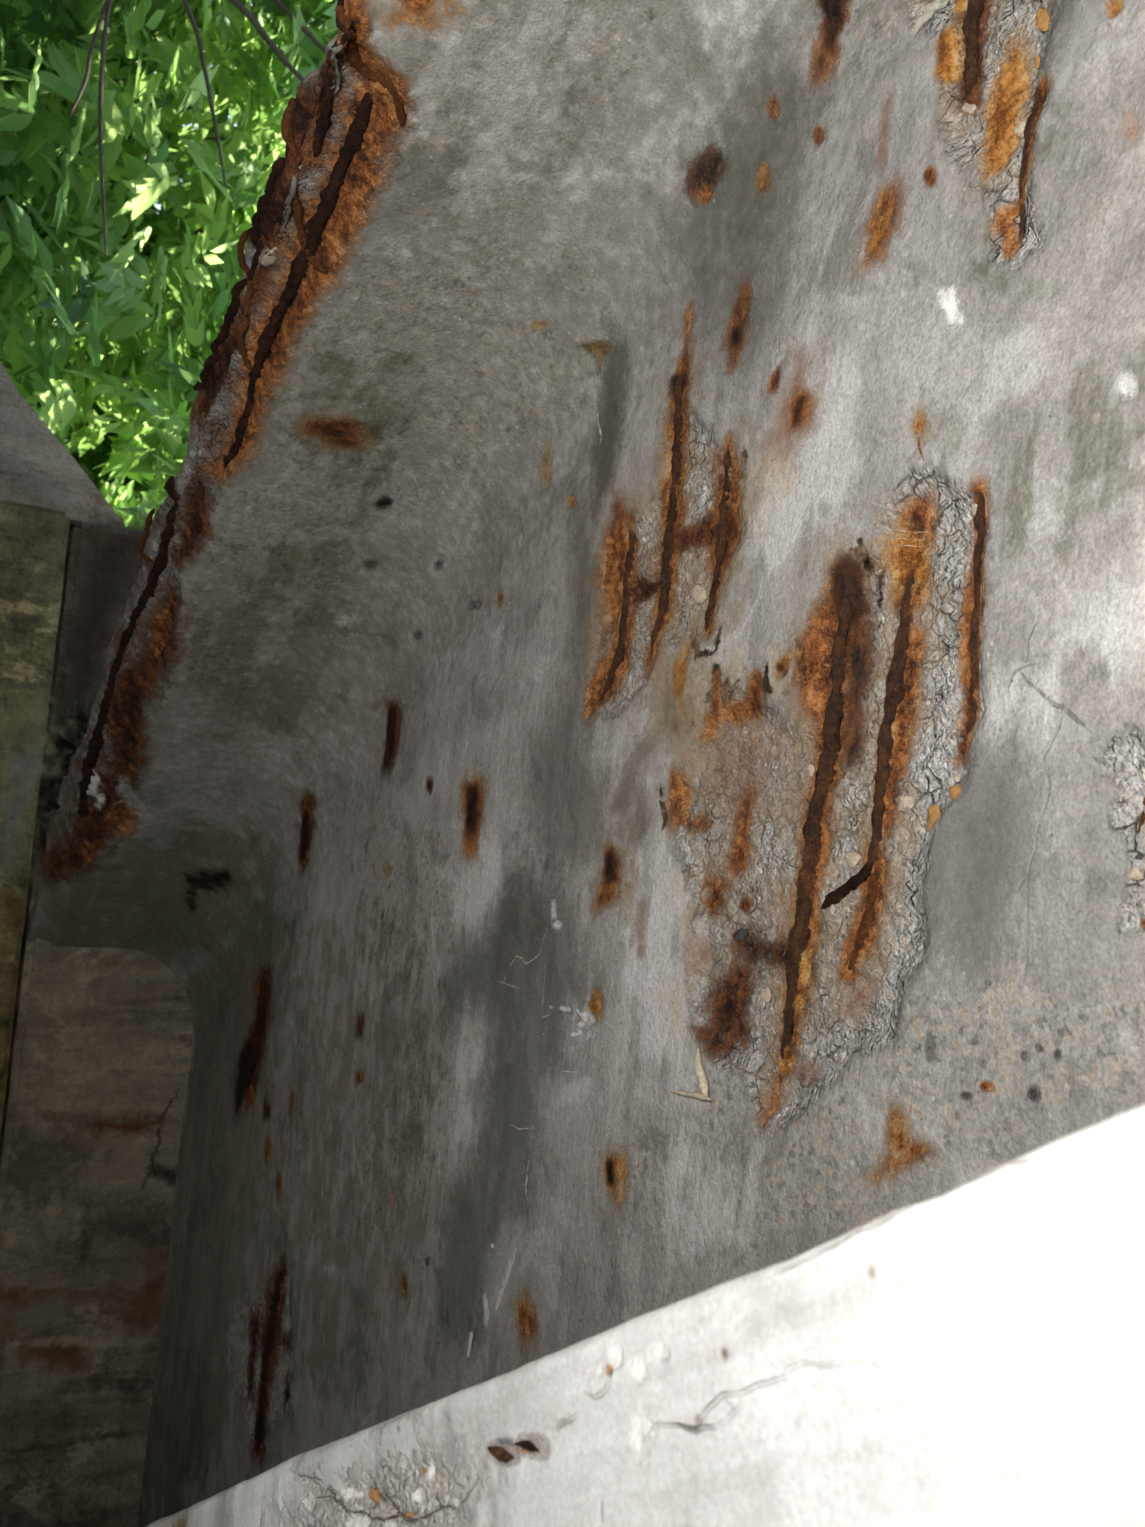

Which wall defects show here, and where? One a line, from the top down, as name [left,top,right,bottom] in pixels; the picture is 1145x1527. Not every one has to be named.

corrosion [923,166,937,186]
spalling [901,0,1062,269]
corrosion [855,181,904,272]
corrosion [579,340,611,371]
corrosion [721,280,752,373]
corrosion [303,414,376,450]
corrosion [727,650,794,728]
corrosion [460,775,486,859]
spalling [665,465,990,1138]
spalling [1094,721,1145,933]
crack [658,1359,904,1431]
spalling [280,1414,549,1527]